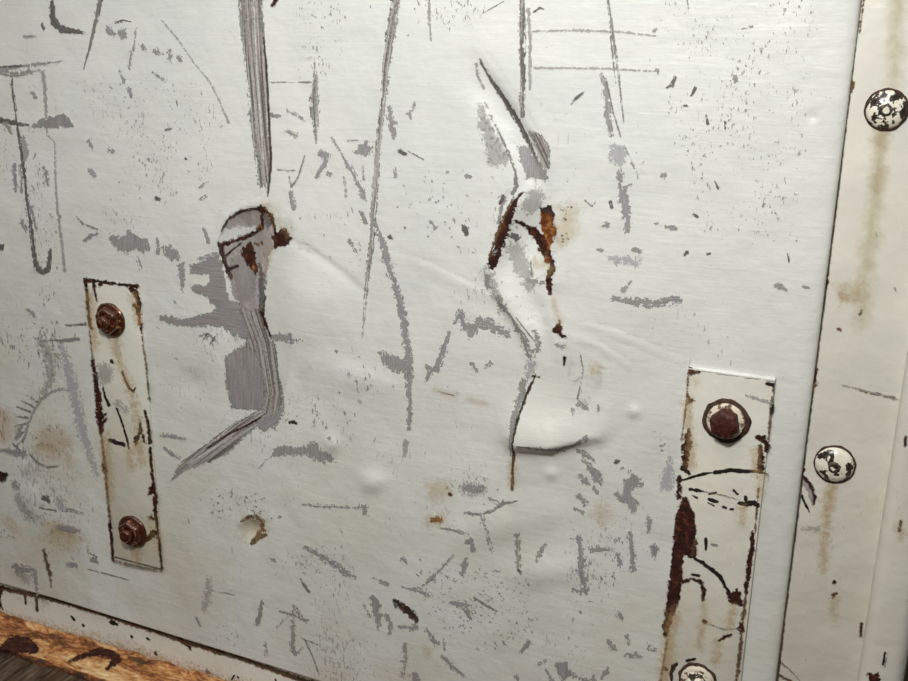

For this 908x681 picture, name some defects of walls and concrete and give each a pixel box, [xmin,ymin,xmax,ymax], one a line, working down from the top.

rust [217,204,277,279]
peeling [427,197,470,252]
rust [487,192,568,295]
peeling [597,247,643,266]
peeling [425,308,511,382]
peeling [108,422,147,447]
rust [240,514,267,545]
rust [659,366,706,681]
rust [0,548,314,681]
rust [735,488,760,681]